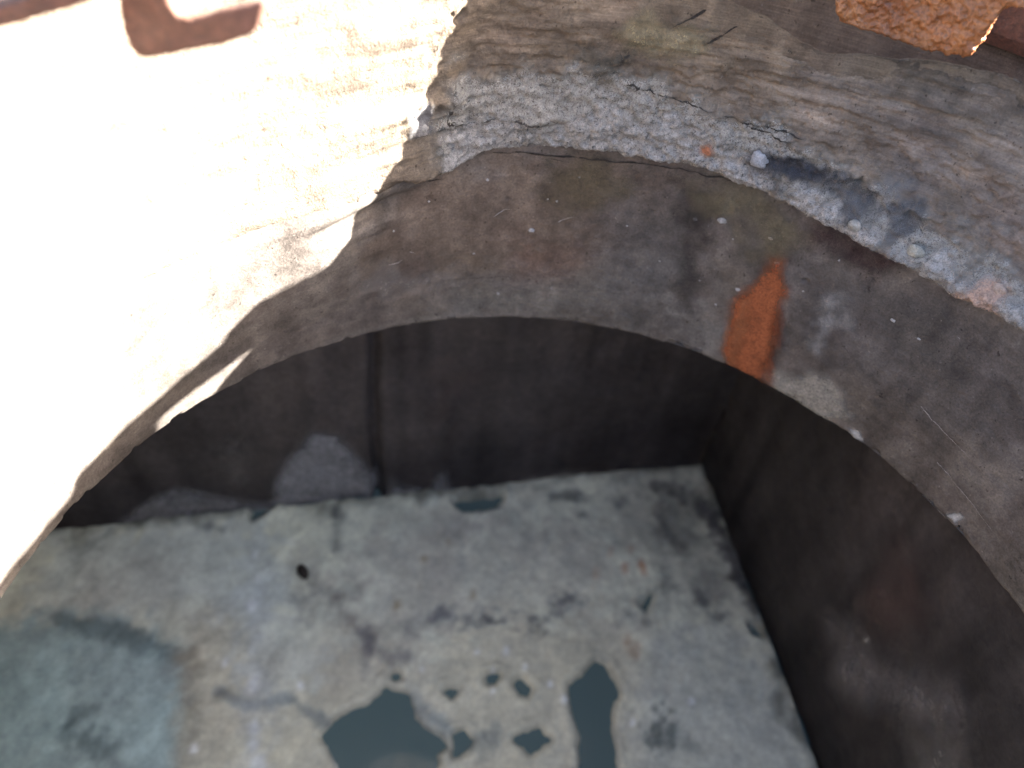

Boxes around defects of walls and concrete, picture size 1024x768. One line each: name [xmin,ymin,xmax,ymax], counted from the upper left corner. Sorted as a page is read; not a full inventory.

crack [447,111,733,182]
crack [617,55,803,146]
damp [430,56,1024,330]
corrosion [723,259,787,382]